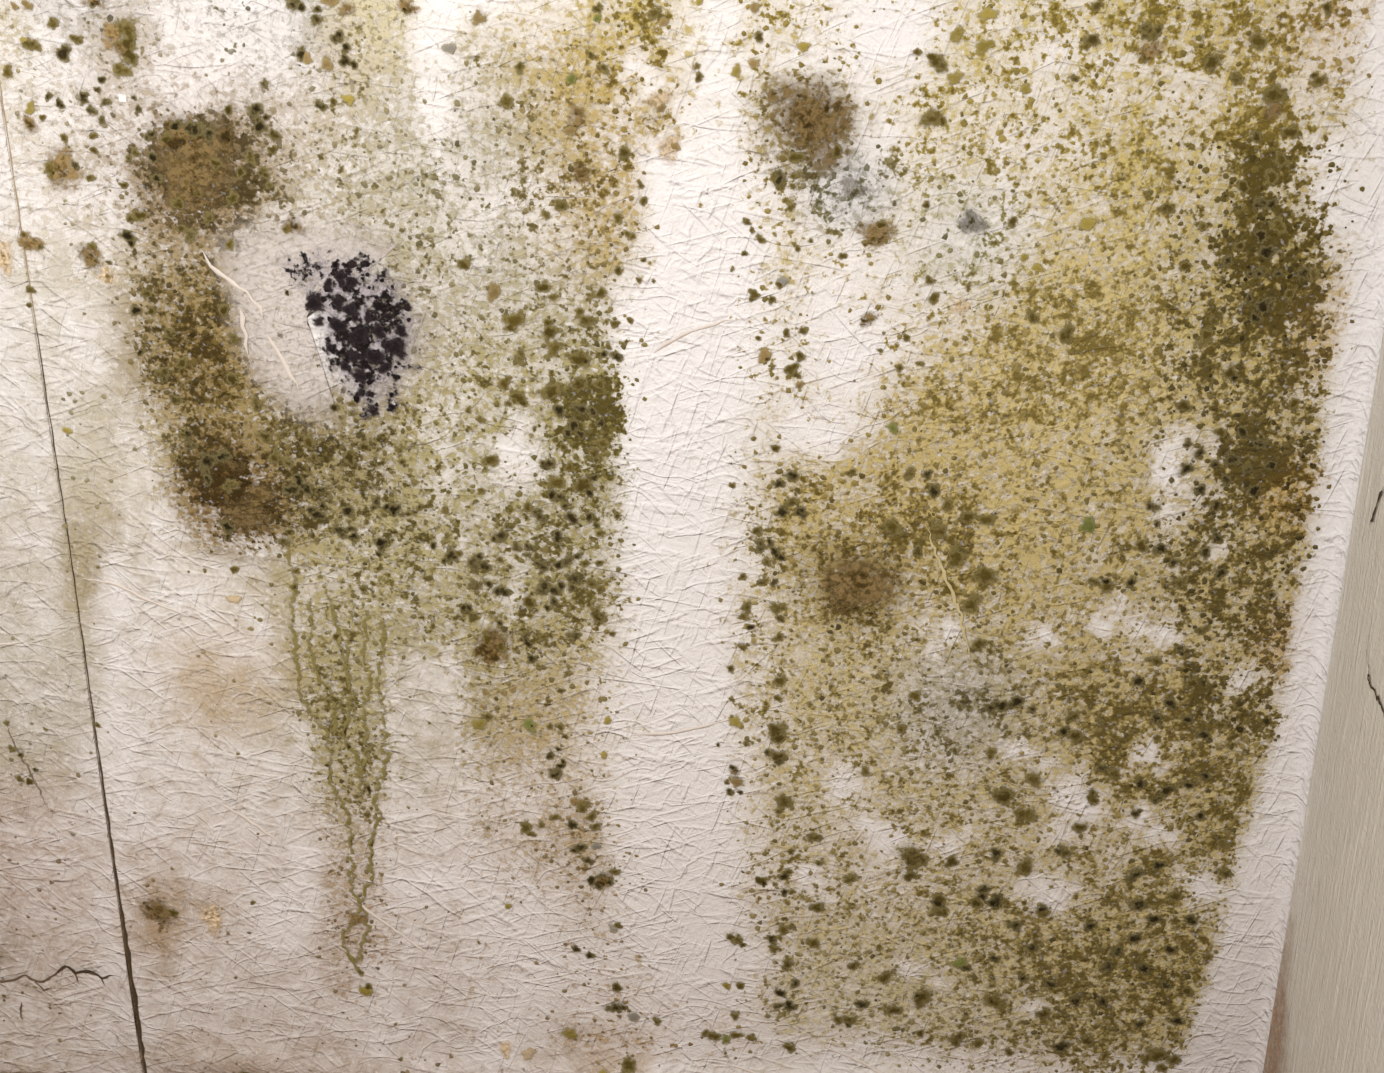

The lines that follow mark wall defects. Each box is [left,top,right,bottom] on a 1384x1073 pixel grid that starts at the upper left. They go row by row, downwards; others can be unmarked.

crack [0,965,122,1020]
leakage [0,0,715,1073]
leakage [700,0,1373,1073]
crack [1367,656,1384,714]